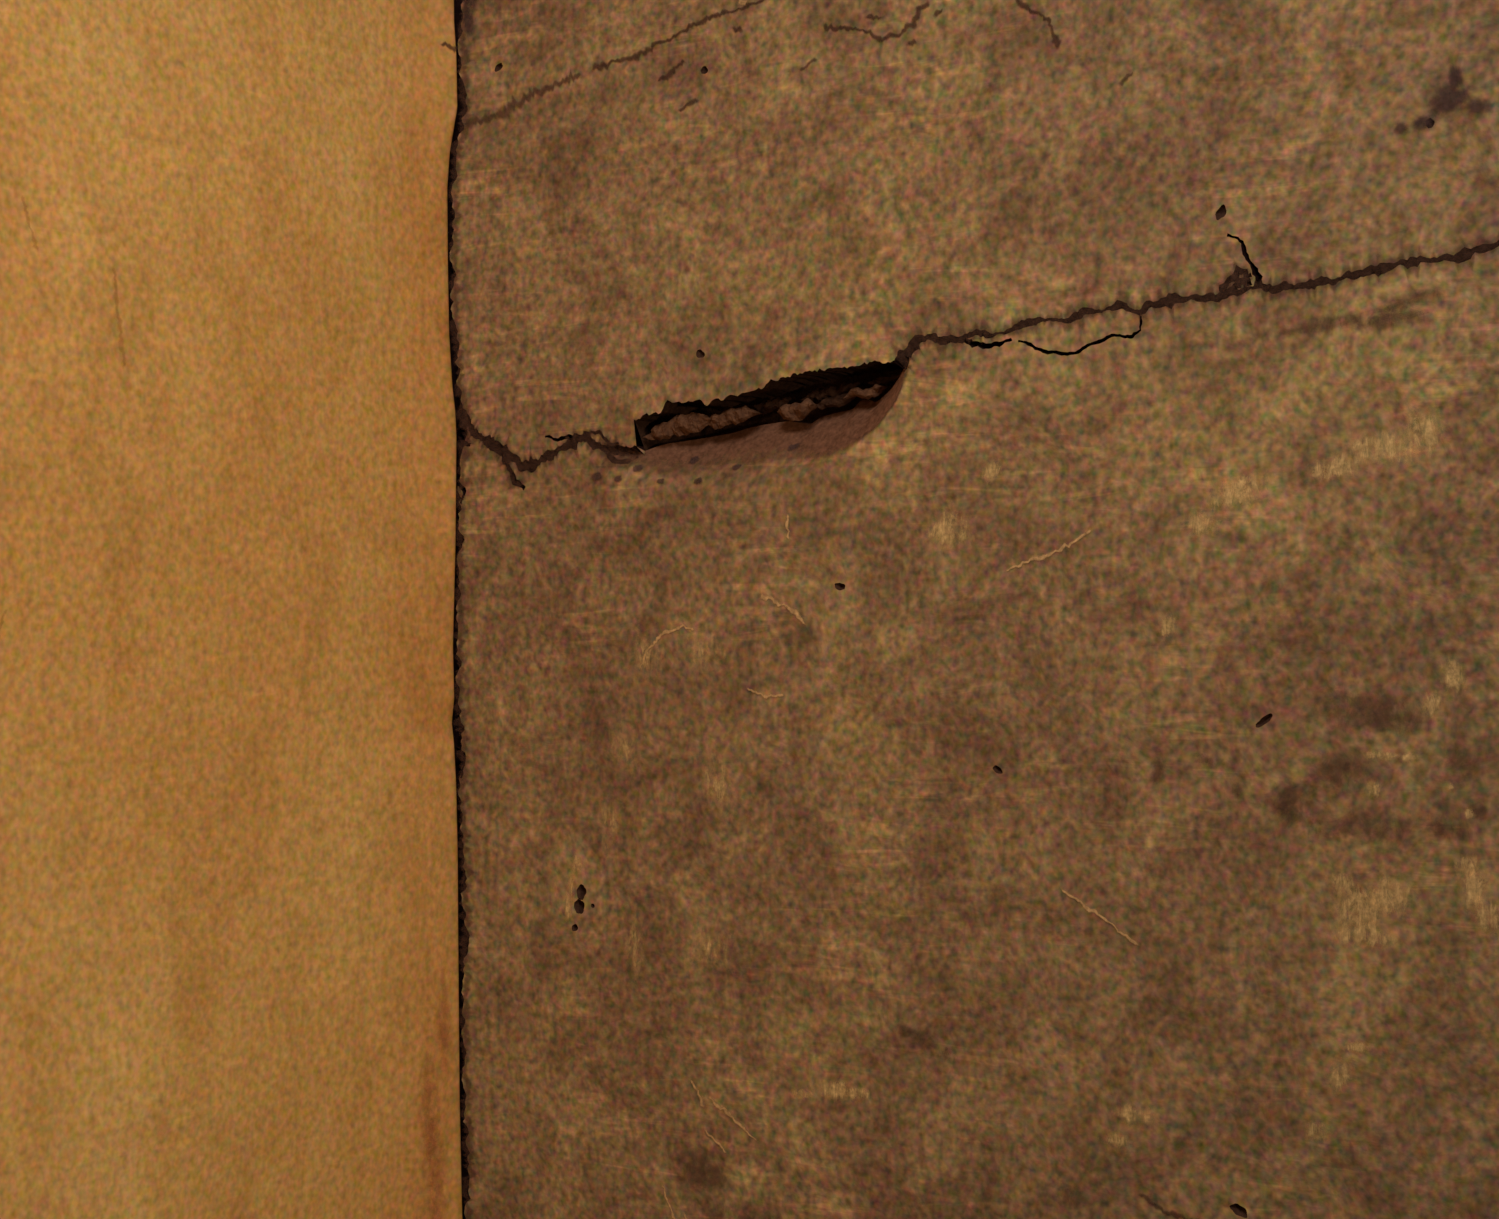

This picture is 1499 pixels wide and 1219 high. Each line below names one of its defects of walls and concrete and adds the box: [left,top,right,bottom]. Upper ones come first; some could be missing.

crack [801,3,942,69]
crack [1016,0,1060,47]
crack [894,234,1499,370]
flaking render [592,360,909,484]
crack [442,0,763,1219]